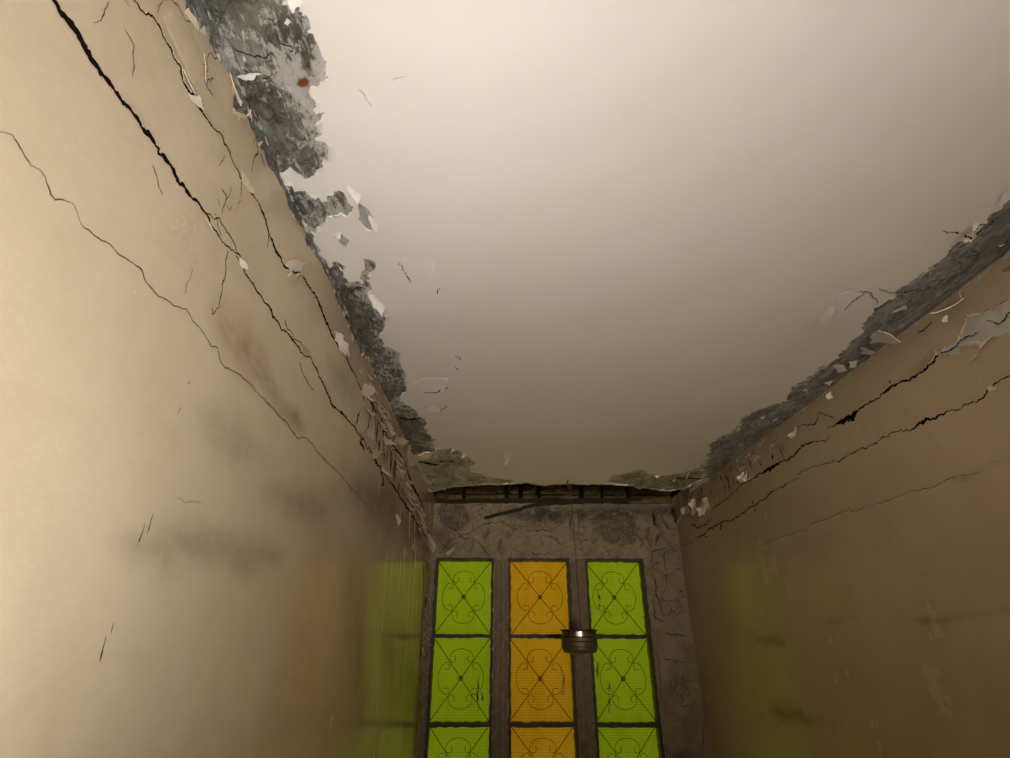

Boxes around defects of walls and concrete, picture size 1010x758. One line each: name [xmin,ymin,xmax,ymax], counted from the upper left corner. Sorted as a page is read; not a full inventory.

crack [0,0,425,535]
spalling [183,0,1010,718]
crack [415,346,1010,756]